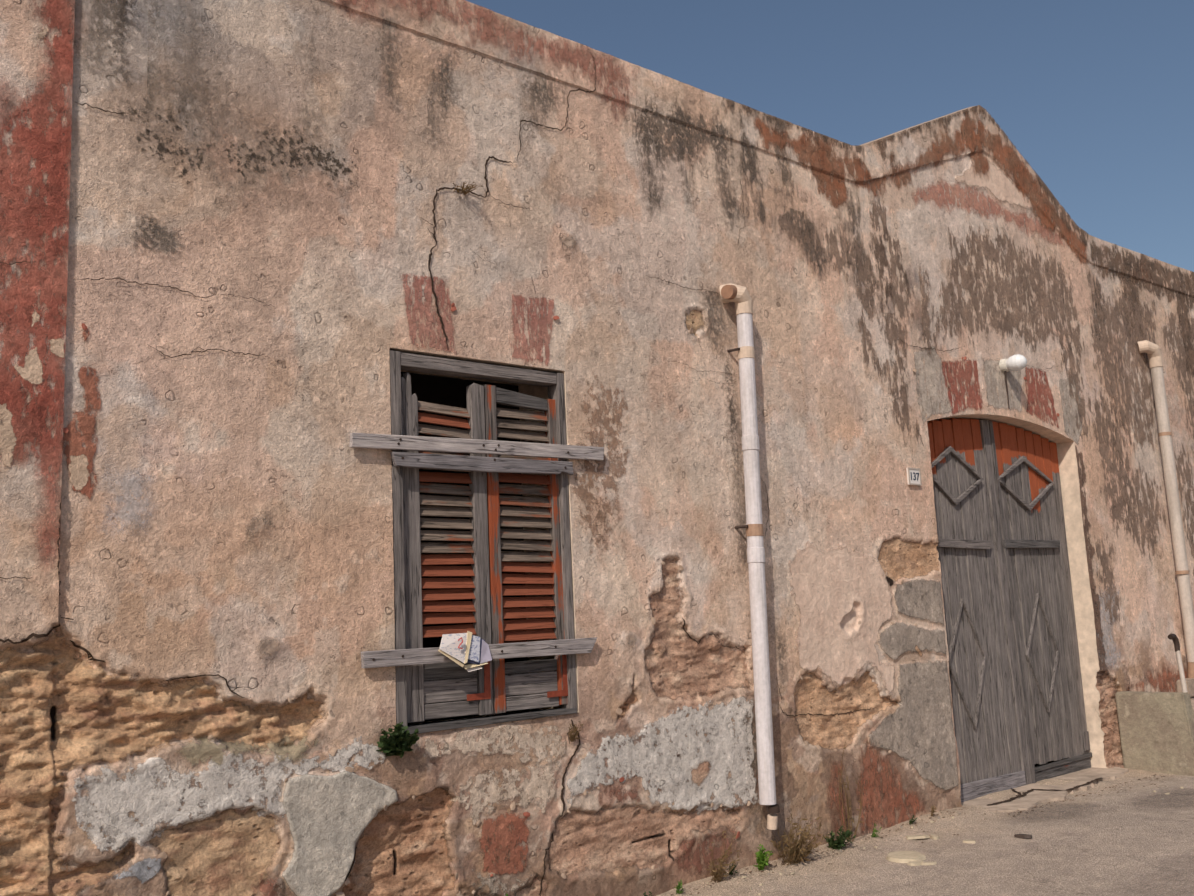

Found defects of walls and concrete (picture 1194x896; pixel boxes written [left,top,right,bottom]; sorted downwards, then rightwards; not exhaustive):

peeling [0,0,101,556]
crack [74,277,275,307]
crack [150,346,266,358]
damp [118,64,357,191]
crack [420,45,597,349]
damp [636,104,739,219]
damp [724,99,1016,186]
damp [757,159,1194,684]
spalling [0,632,385,896]
peeling [335,558,759,896]
crack [539,719,581,896]
peeling [788,538,939,750]